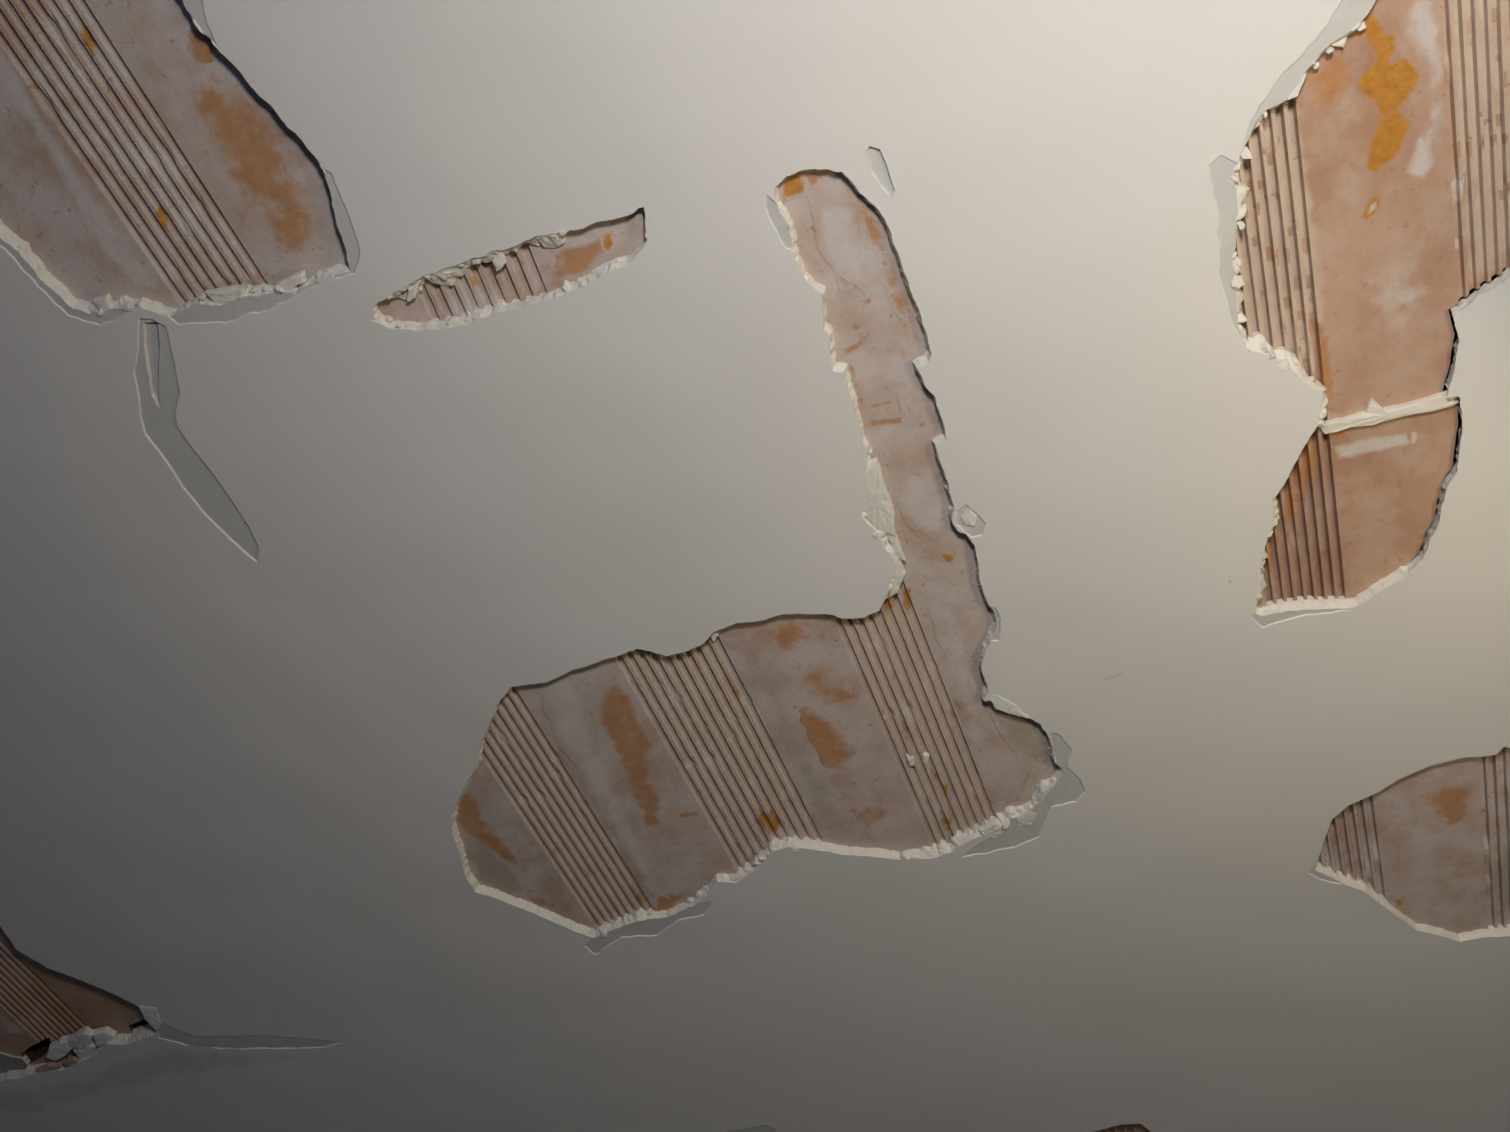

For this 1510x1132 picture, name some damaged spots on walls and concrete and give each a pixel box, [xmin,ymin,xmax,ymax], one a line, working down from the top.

flaking render [0,0,360,564]
flaking render [372,207,647,331]
flaking render [1208,0,1510,628]
flaking render [451,146,1085,955]
flaking render [1308,747,1510,942]
flaking render [0,926,342,1082]
flaking render [1094,1124,1151,1132]